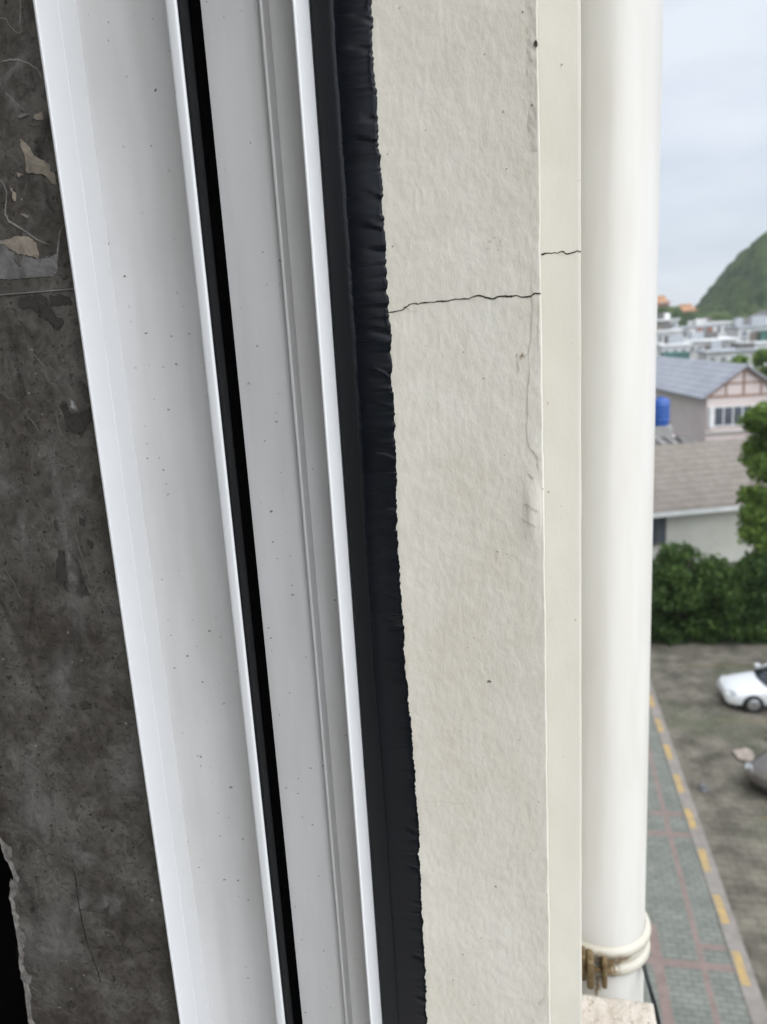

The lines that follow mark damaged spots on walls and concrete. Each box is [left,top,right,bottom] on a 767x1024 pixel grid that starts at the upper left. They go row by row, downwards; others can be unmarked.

crack [388,250,581,475]